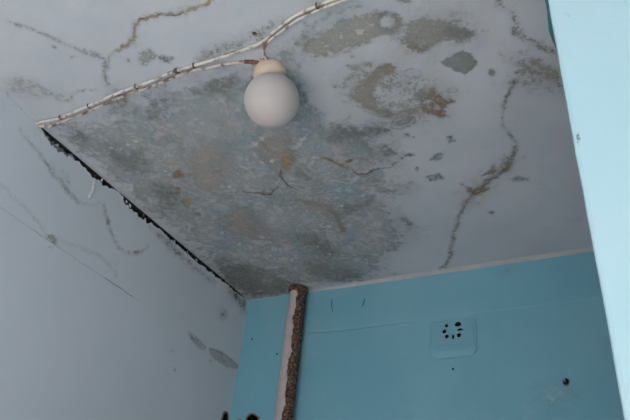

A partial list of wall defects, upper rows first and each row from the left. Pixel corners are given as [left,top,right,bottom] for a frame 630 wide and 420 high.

peeling [295,12,472,58]
damp [351,63,415,126]
crack [41,128,244,297]
damp [69,76,404,306]
crack [321,157,396,175]